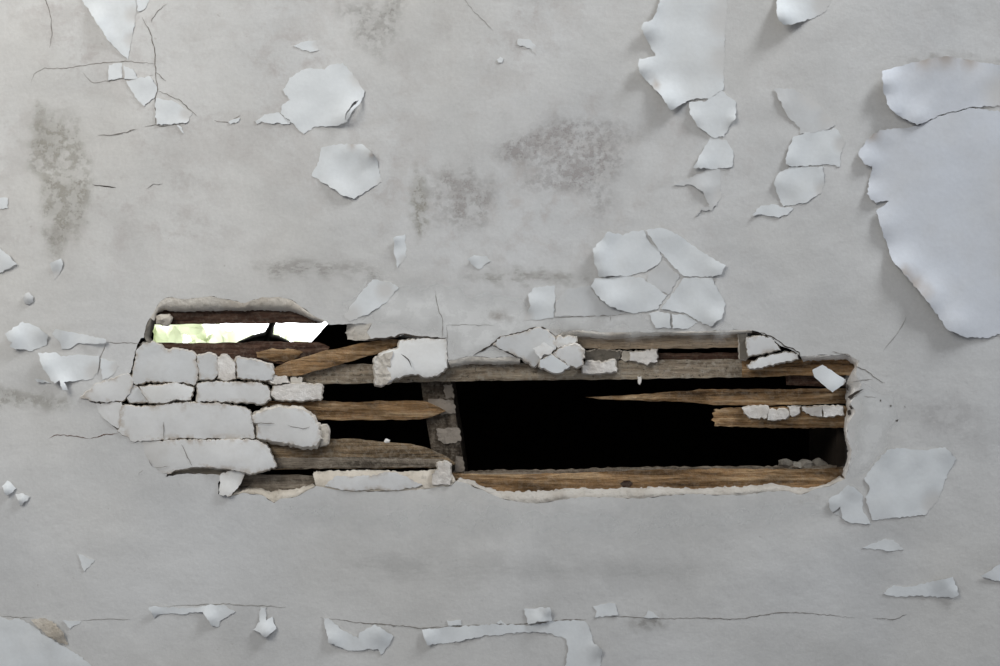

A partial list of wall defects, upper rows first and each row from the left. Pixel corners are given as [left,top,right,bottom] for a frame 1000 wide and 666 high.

crack [32,0,239,136]
peeling [82,0,192,133]
peeling [255,63,365,134]
peeling [638,0,736,216]
peeling [753,88,845,218]
peeling [858,56,1000,338]
spalling [144,296,325,343]
peeling [523,228,752,340]
peeling [229,354,956,524]
crack [167,601,283,609]
crack [321,617,586,629]
crack [614,612,907,620]